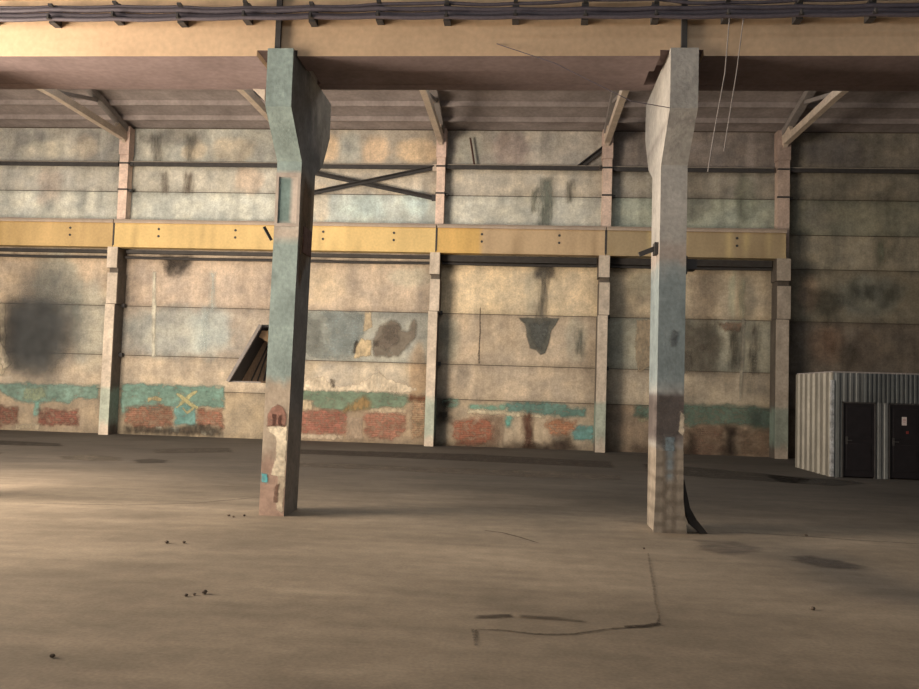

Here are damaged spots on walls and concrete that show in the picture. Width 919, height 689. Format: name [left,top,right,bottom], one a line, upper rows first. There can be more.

peeling [306,311,372,358]
leakage [520,267,559,355]
peeling [120,383,225,429]
peeling [262,405,287,512]
crack [472,568,661,645]